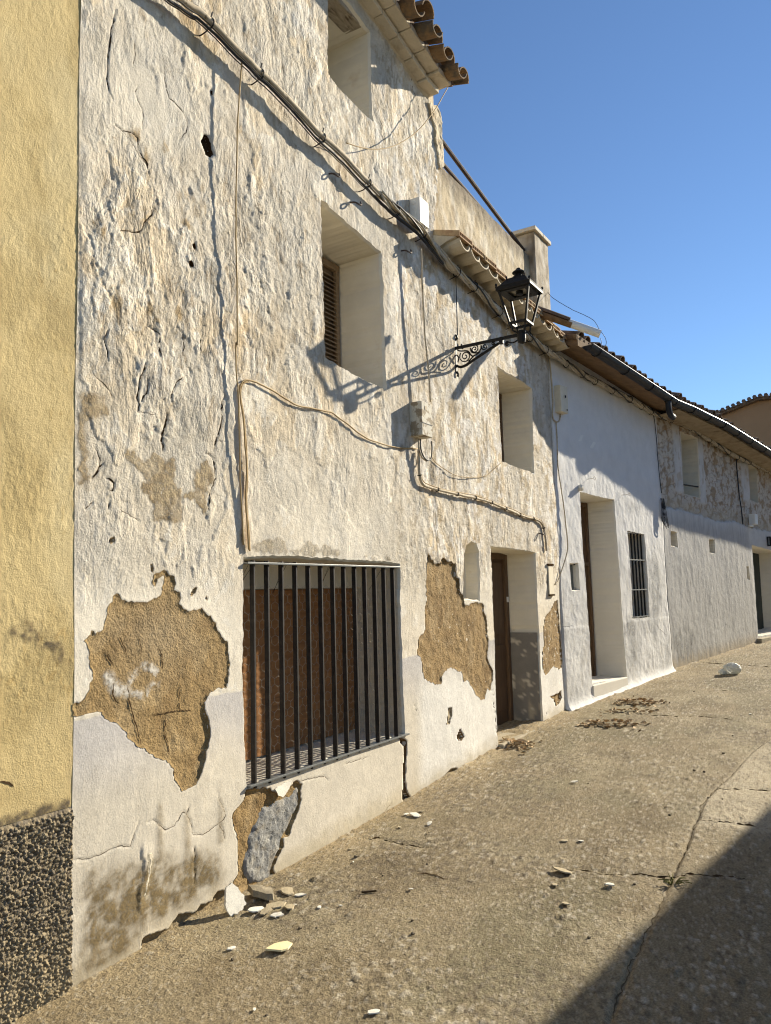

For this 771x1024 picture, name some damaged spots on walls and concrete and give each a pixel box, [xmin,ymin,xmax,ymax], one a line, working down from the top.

crack [107,19,136,90]
crack [116,89,148,168]
crack [120,213,153,233]
crack [93,327,201,450]
crack [205,402,223,517]
flaking render [72,564,230,791]
flaking render [417,553,493,700]
flaking render [542,600,562,675]
crack [77,797,226,877]
leakage [85,855,220,967]
flaking render [141,779,302,949]